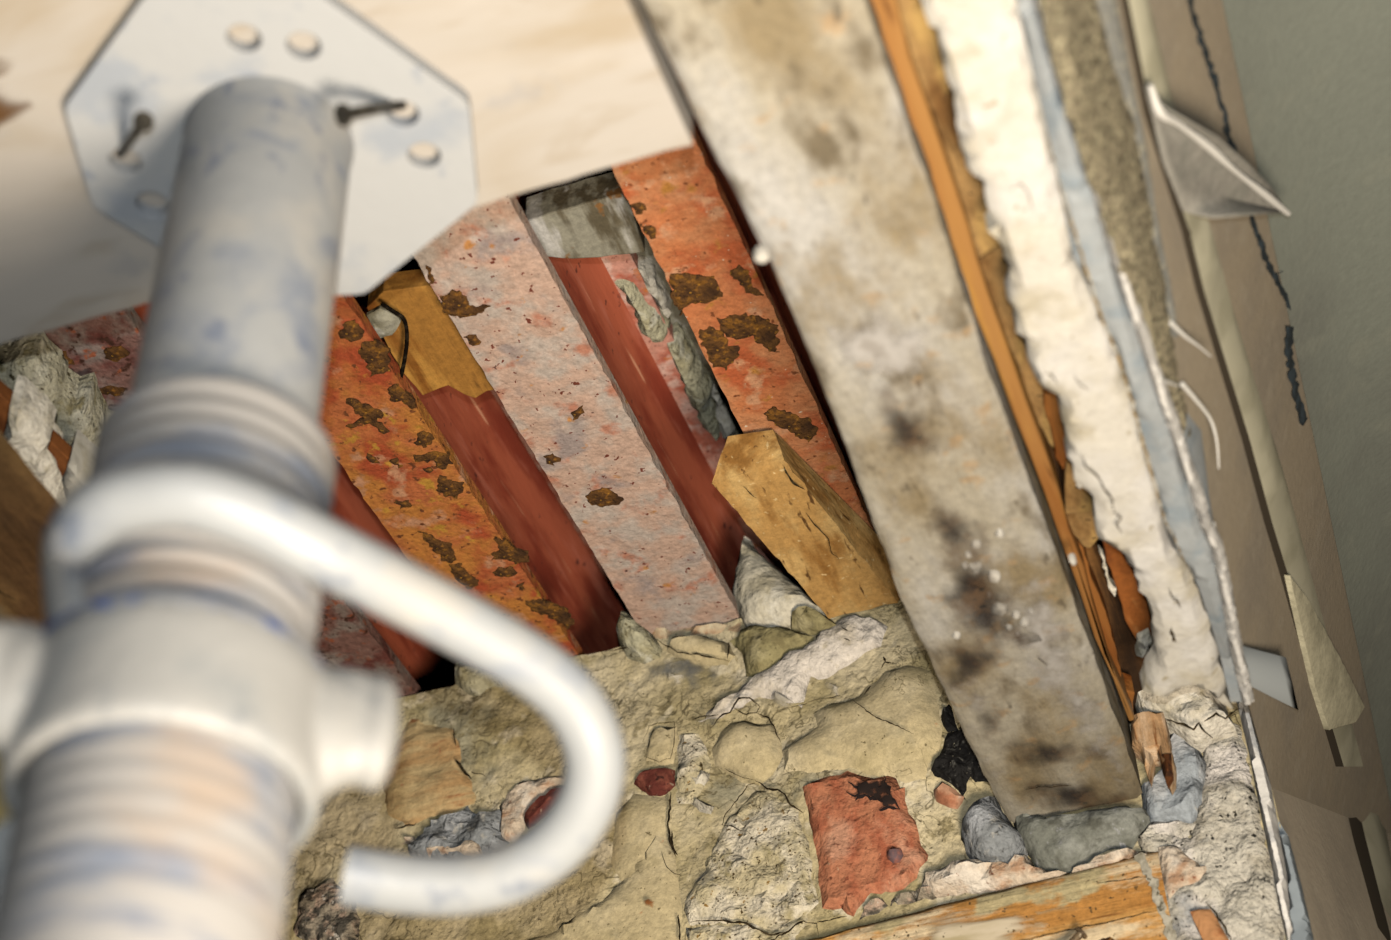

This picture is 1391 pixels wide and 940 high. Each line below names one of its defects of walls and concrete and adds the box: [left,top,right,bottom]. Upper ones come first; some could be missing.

efflorescence [846,327,917,371]
damp [894,416,927,445]
damp [942,519,962,541]
damp [954,572,999,629]
crack [609,639,730,661]
damp [652,661,702,679]
efflorescence [698,614,888,722]
damp [956,650,991,681]
damp [1016,604,1066,688]
crack [643,657,913,875]
damp [1039,748,1065,762]
damp [1036,788,1096,806]